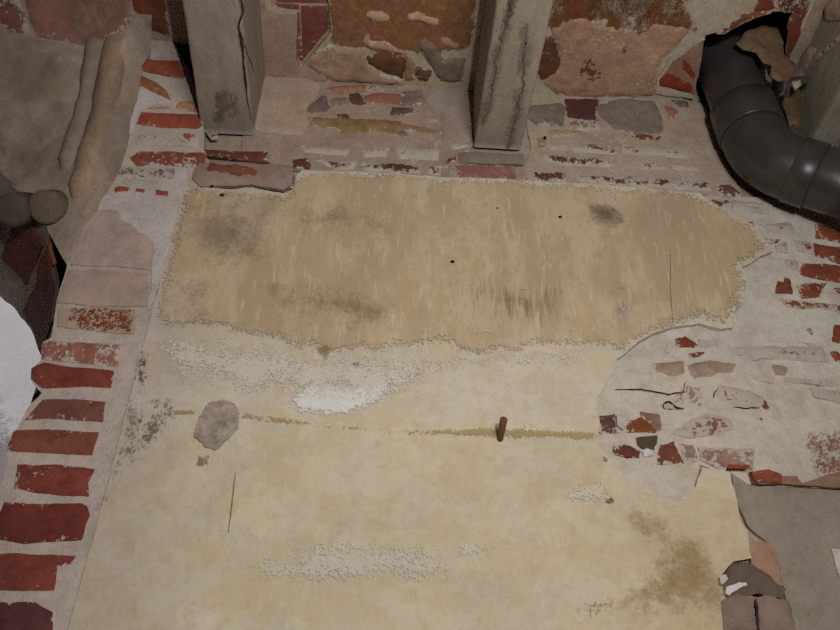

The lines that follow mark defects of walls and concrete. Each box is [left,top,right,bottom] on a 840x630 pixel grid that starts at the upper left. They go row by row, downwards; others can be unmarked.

spalling [366,11,389,23]
spalling [407,11,439,25]
spalling [716,0,810,58]
spalling [241,17,840,502]